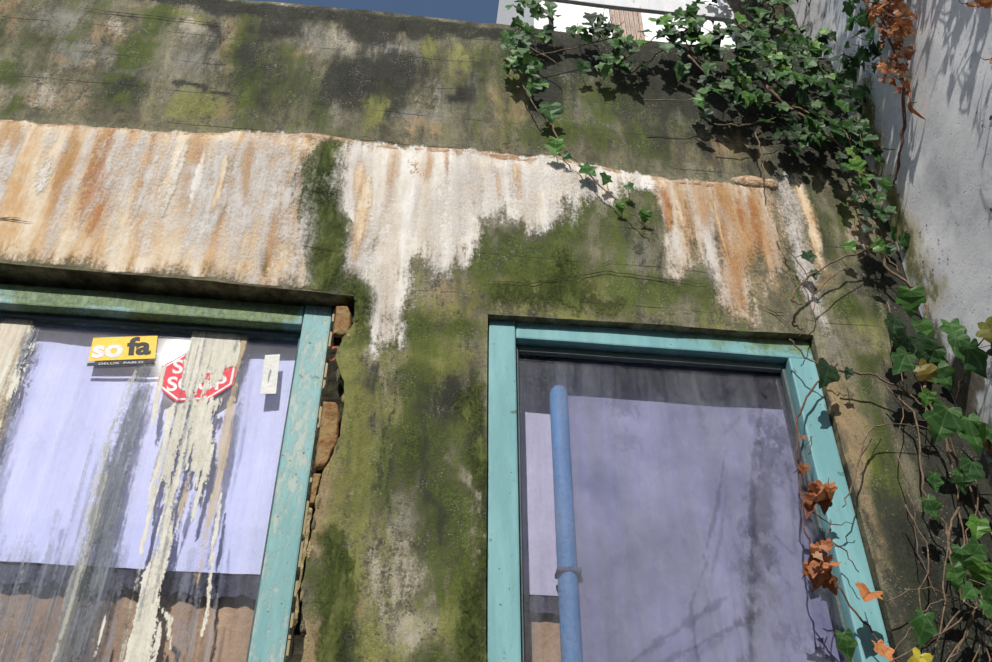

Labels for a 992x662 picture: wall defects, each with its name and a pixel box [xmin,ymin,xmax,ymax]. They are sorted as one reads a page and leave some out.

water stain [0,120,824,355]
spalling [285,304,356,662]
water stain [924,314,985,418]
water stain [316,613,341,662]